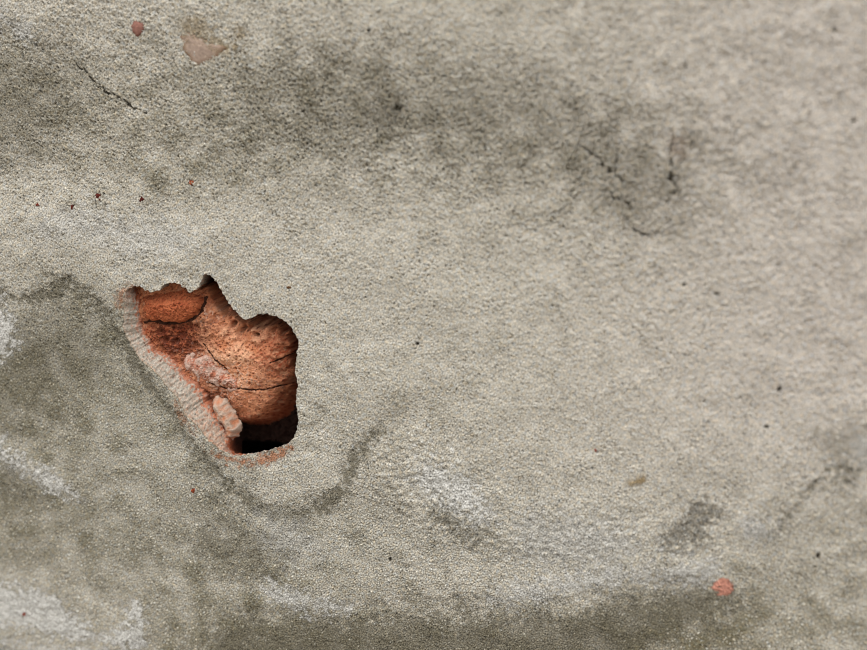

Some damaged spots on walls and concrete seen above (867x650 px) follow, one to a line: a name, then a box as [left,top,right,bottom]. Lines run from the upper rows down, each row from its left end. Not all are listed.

spalling [122,274,299,456]